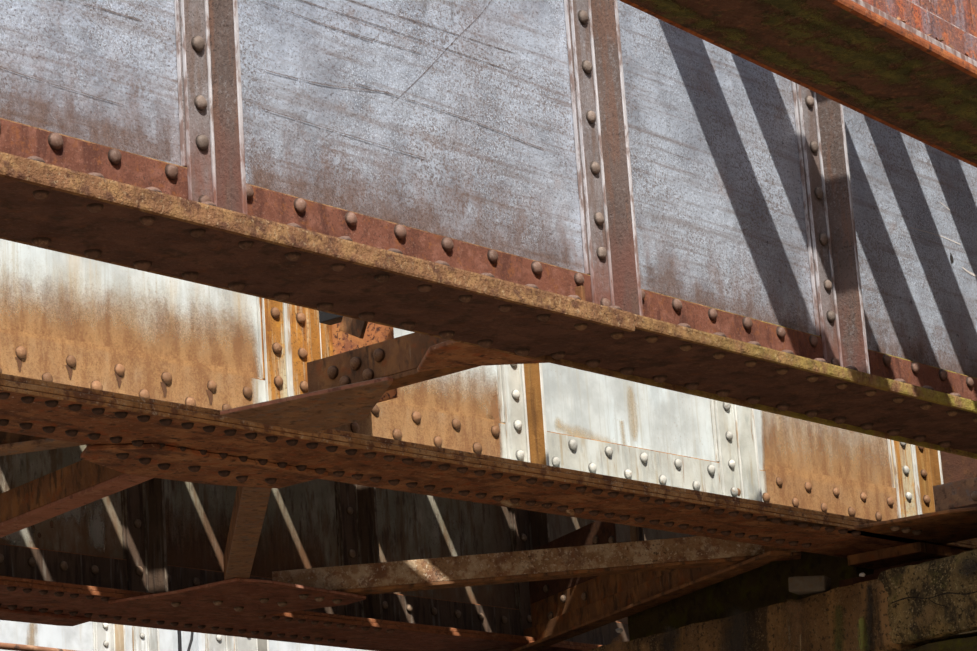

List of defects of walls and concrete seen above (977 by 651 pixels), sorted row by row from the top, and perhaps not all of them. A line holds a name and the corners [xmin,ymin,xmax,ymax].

rust [0,292,259,410]
rust [330,380,502,457]
rust [763,417,899,521]